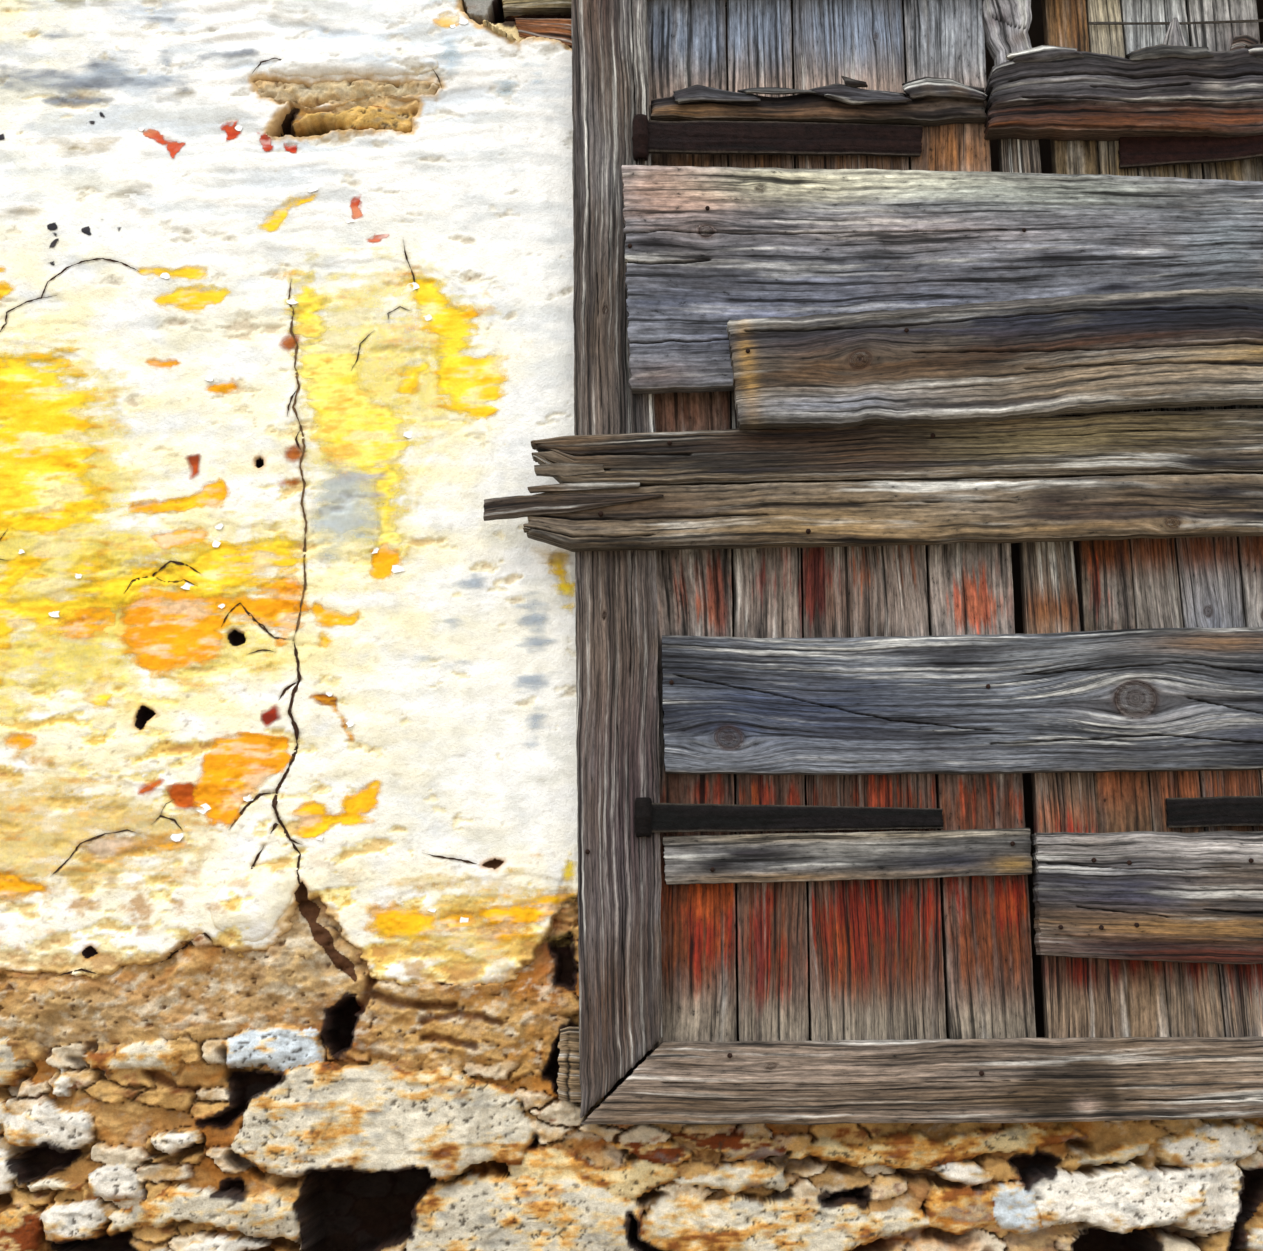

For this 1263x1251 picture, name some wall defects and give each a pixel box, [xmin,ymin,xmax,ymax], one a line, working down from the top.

spalling [434,0,571,42]
spalling [253,79,439,153]
crack [0,258,138,332]
peeling [138,266,230,311]
peeling [286,270,506,579]
peeling [0,348,359,716]
spalling [135,706,156,730]
peeling [310,692,354,741]
peeling [0,732,291,901]
peeling [293,780,380,841]
spalling [483,859,512,872]
spalling [0,862,1263,1251]